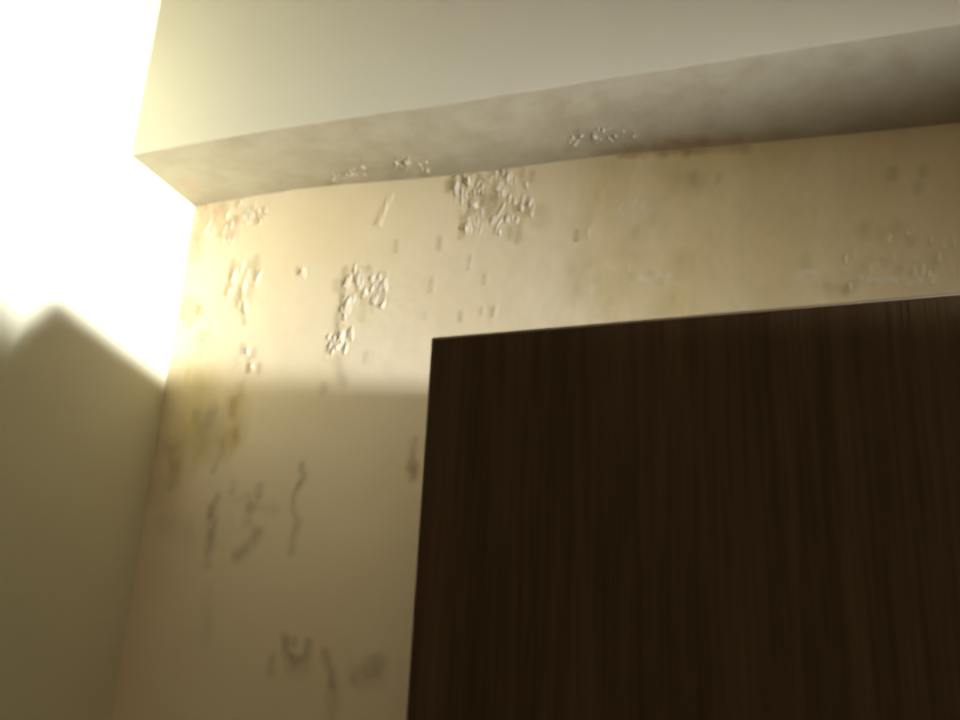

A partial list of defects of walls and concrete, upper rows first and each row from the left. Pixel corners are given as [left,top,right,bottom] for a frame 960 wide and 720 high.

peeling [451,168,535,246]
peeling [201,198,273,330]
peeling [322,261,390,359]